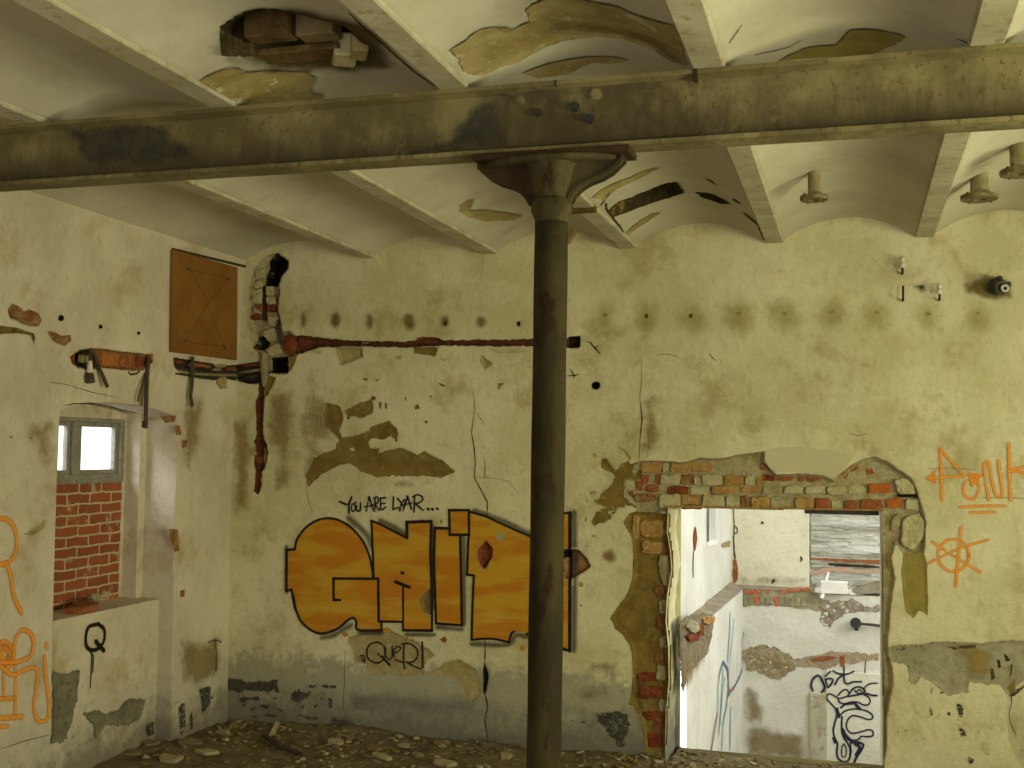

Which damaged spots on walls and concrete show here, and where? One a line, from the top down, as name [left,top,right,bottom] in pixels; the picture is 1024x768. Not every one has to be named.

peeling [200,69,325,106]
spalling [332,32,369,67]
peeling [449,0,688,78]
spalling [593,168,730,235]
spalling [8,304,153,375]
peeling [305,390,455,486]
crack [471,394,517,511]
spalling [564,447,1024,758]
peeling [51,670,146,744]
crack [482,642,490,742]